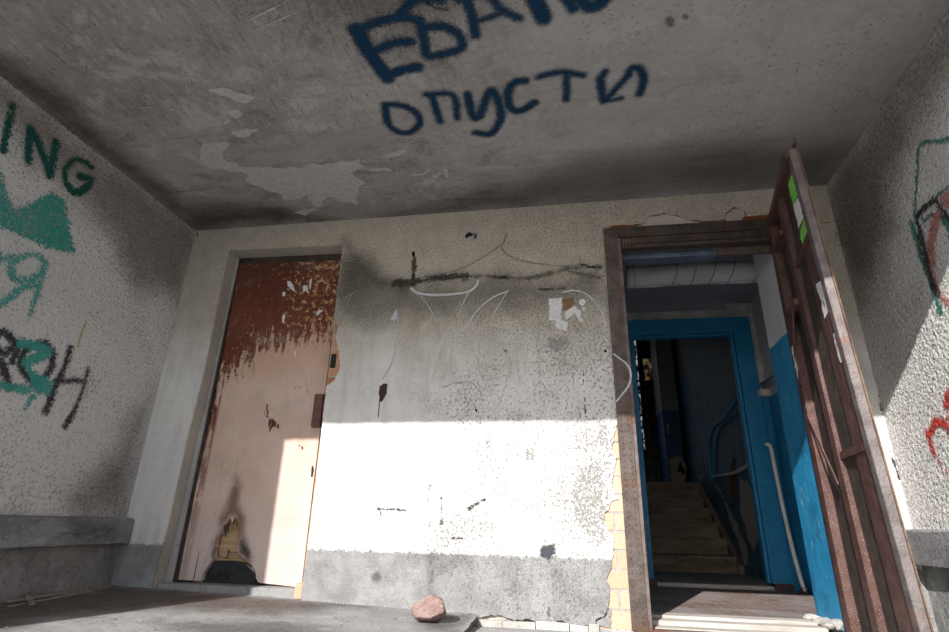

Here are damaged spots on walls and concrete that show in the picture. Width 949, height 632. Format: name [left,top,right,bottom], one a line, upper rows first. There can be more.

peeling [197,87,406,216]
flaking render [634,213,699,226]
flaking render [725,207,746,221]
flaking render [328,323,340,385]
flaking render [570,417,634,632]